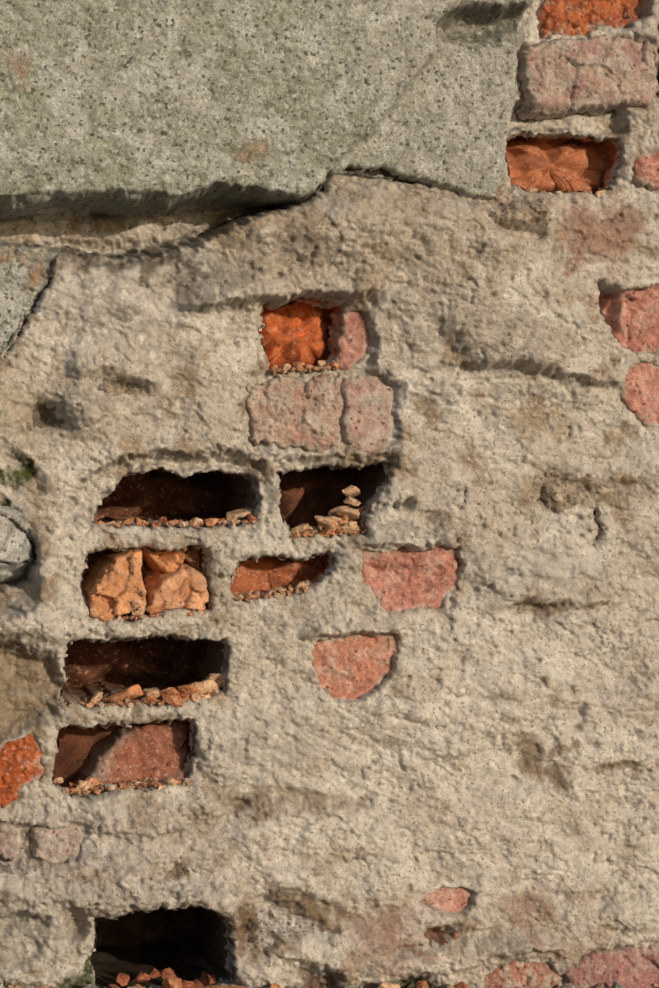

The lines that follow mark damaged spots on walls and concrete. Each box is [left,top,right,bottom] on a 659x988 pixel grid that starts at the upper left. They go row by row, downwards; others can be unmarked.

spalling [258,298,340,370]
spalling [26,403,65,432]
spalling [97,376,145,397]
spalling [92,467,259,529]
spalling [276,462,390,537]
spalling [80,546,211,623]
hole [230,553,333,601]
spalling [59,635,229,707]
spalling [52,719,195,797]
hole [90,906,234,985]